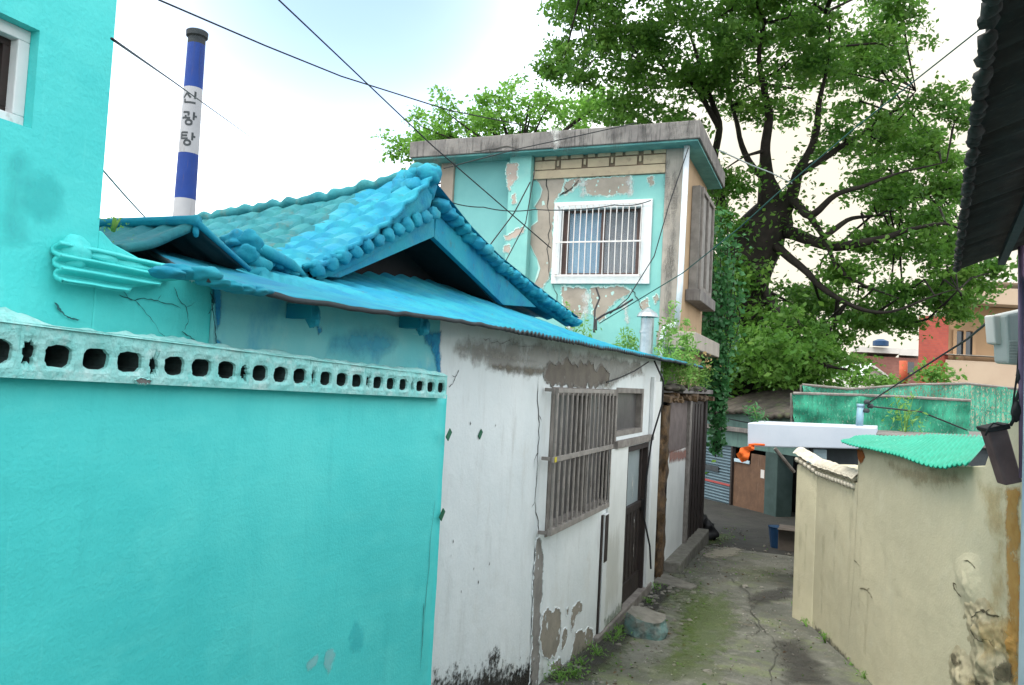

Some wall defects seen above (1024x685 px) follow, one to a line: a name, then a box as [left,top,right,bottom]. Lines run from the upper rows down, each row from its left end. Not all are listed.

flaking render [505,162,519,205]
flaking render [502,175,633,289]
crack [54,302,78,321]
crack [120,289,217,343]
flaking render [560,284,660,331]
leakage [457,341,642,389]
flaking render [543,357,610,389]
rust [1004,488,1021,684]
peeling [528,536,593,685]
crack [726,574,779,684]
leakage [432,648,534,685]